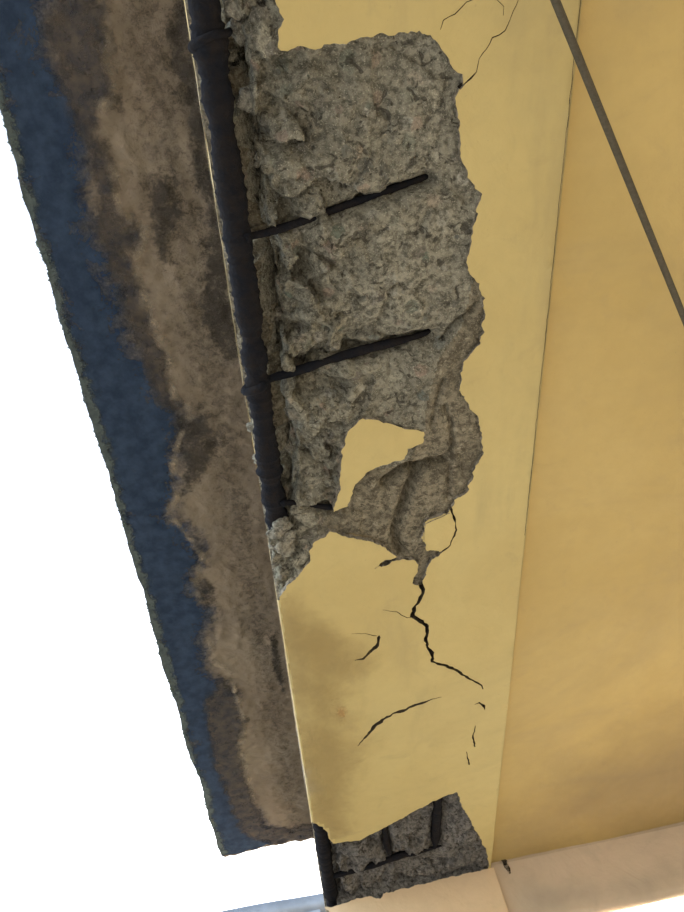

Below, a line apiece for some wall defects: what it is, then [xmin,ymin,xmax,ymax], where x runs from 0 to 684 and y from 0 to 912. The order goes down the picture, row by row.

leakage [0,0,314,856]
spalling [220,0,484,596]
spalling [330,792,488,905]
crack [411,582,484,707]